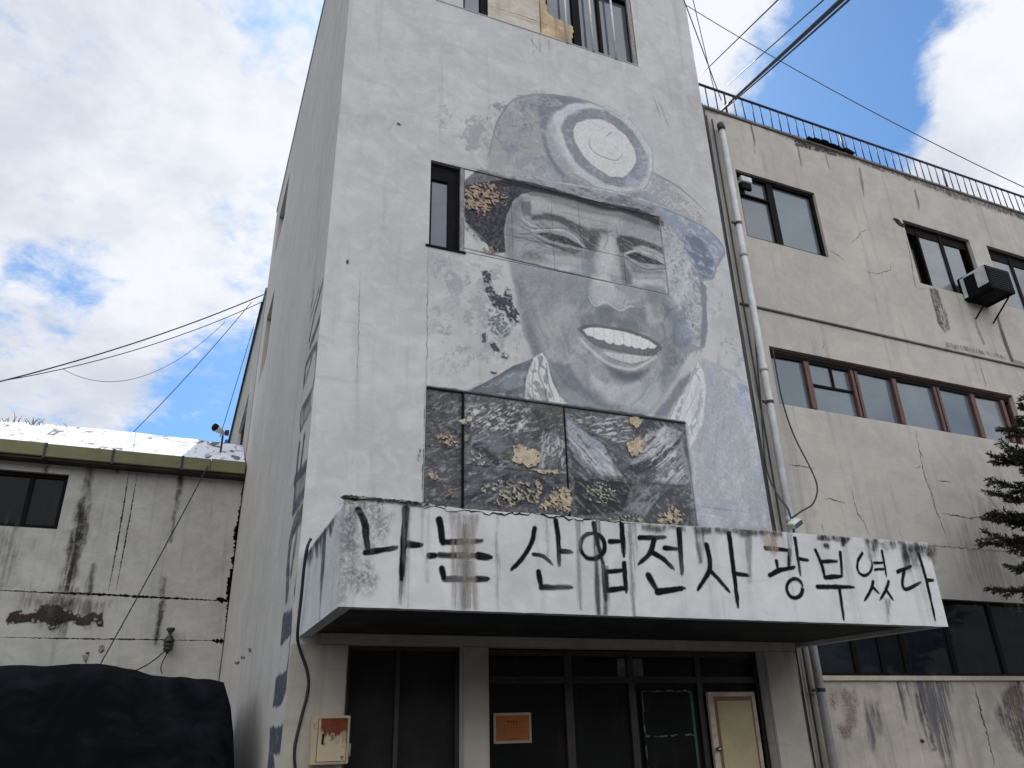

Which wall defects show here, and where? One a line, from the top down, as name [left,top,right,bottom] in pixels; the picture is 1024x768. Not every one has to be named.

peeling [465,181,508,216]
peeling [482,270,520,359]
water stain [930,289,949,329]
peeling [481,447,574,516]
peeling [586,482,616,503]
crack [916,437,1004,552]
water stain [54,473,92,626]
crack [1,472,245,644]
water stain [866,538,935,567]
flaking render [6,603,103,631]
water stain [897,681,951,766]
water stain [998,681,1024,751]